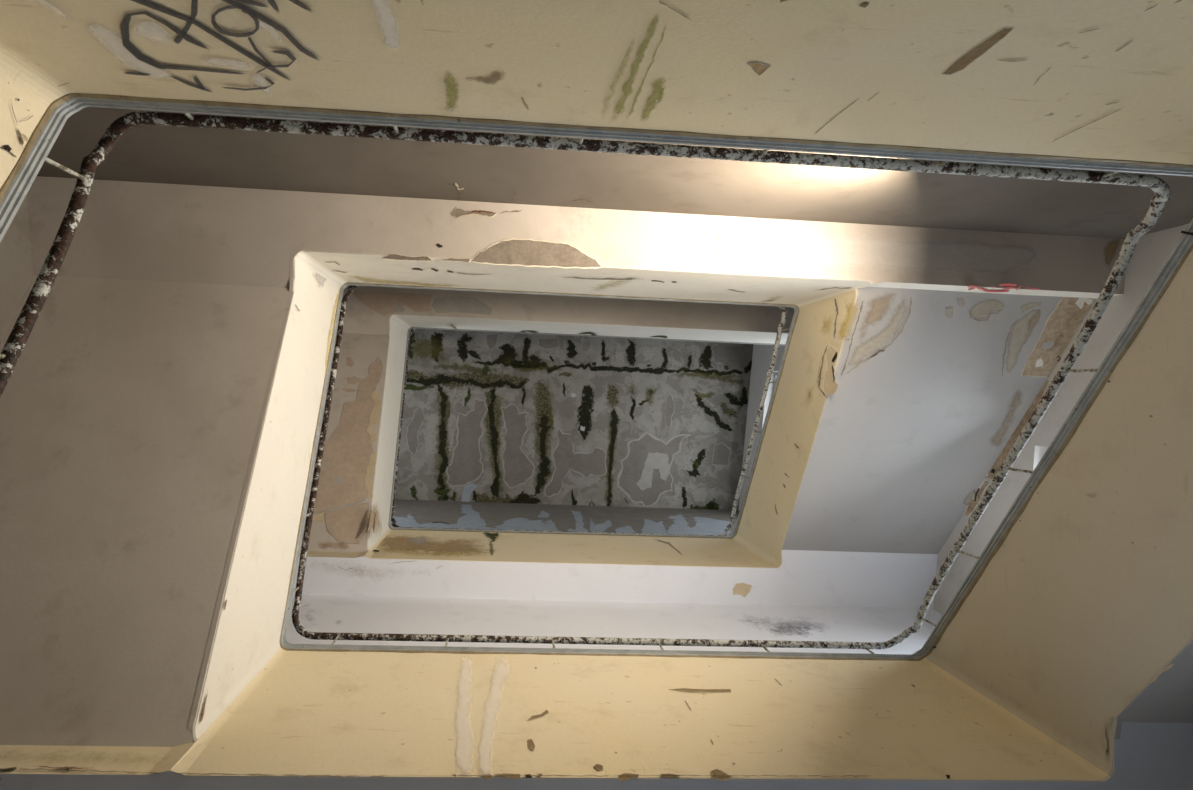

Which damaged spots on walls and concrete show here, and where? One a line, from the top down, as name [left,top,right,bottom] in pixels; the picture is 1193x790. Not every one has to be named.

spalling [941,27,1014,75]
water stain [629,27,666,115]
crack [0,106,33,157]
spalling [381,238,602,269]
peeling [713,346,753,369]
water stain [688,400,723,435]
water stain [424,422,455,457]
water stain [661,448,710,502]
spalling [452,764,829,781]